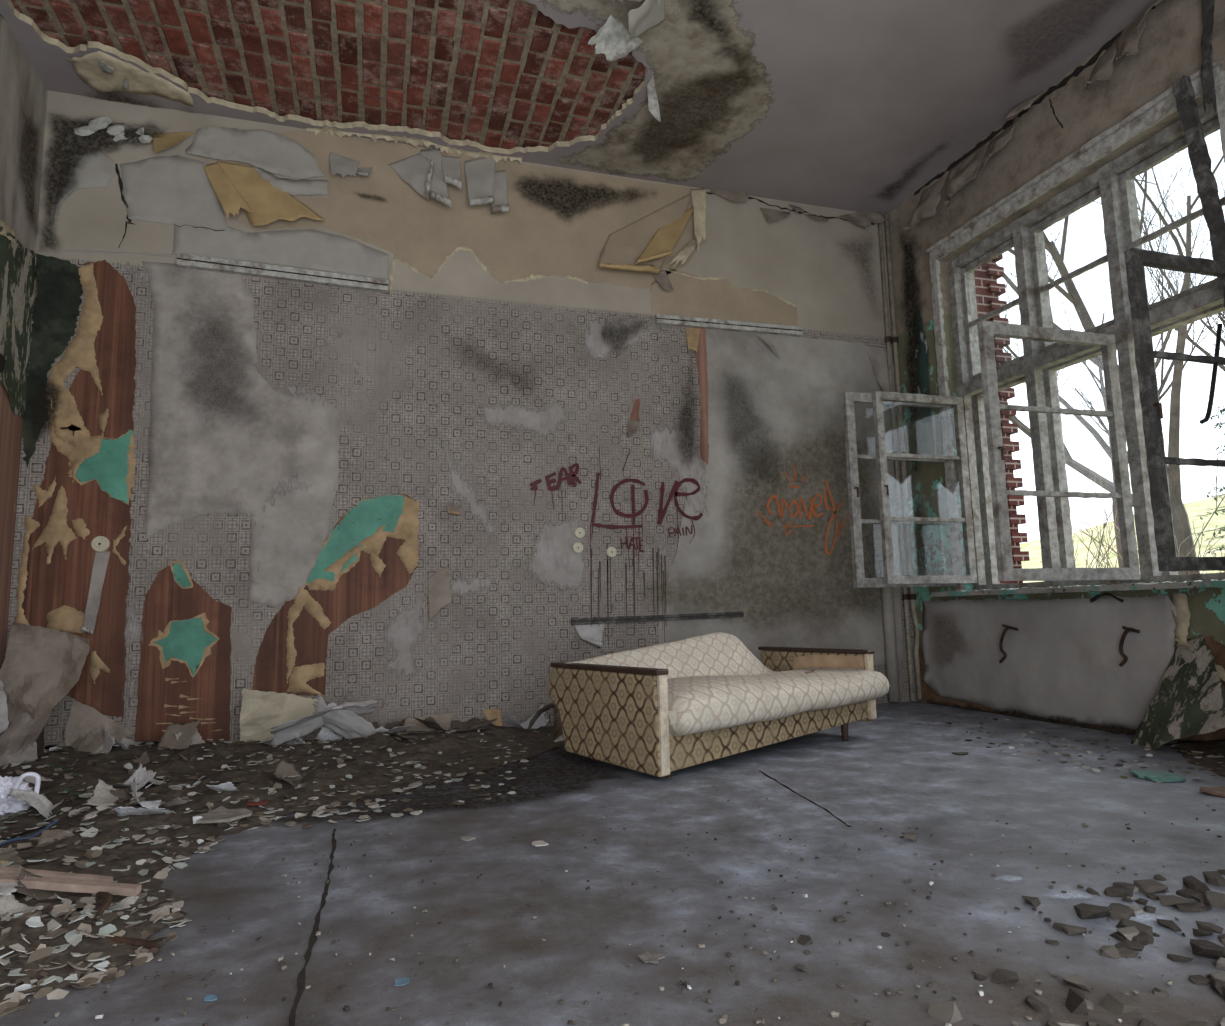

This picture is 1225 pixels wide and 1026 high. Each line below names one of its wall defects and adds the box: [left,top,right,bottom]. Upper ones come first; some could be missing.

water stain [693,0,724,33]
flaking render [11,0,774,294]
water stain [632,77,741,163]
crack [914,31,1122,196]
crack [115,164,134,248]
mould [519,180,640,218]
peeling [760,204,829,223]
flaking render [0,219,83,468]
peeling [81,551,110,635]
crack [289,828,337,1026]